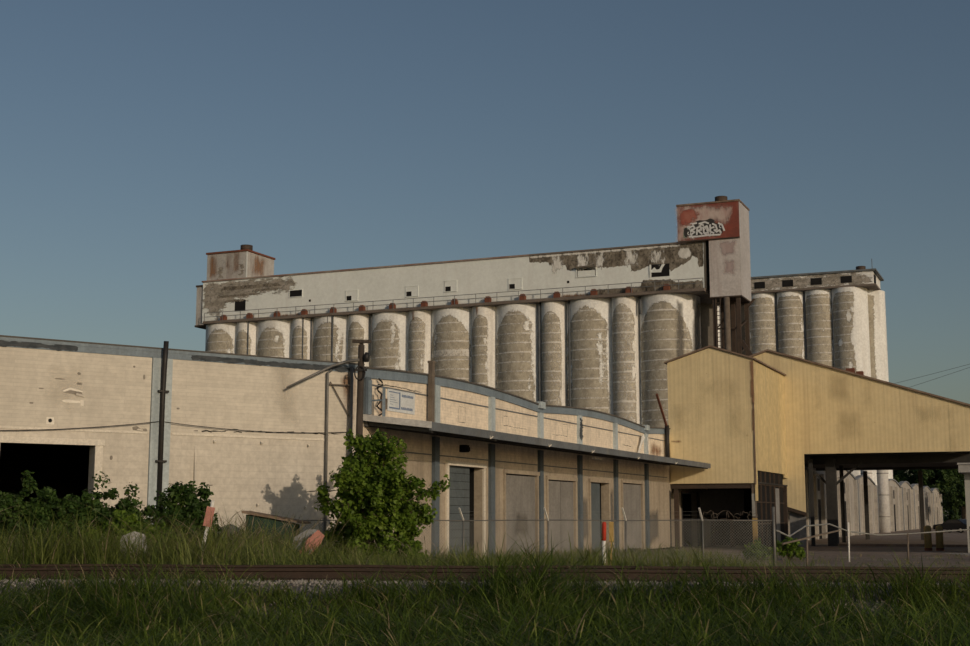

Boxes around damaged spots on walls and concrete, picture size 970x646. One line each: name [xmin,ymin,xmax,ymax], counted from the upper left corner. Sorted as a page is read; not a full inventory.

peeling [191,206,732,453]
peeling [749,291,856,373]
peeling [868,295,877,378]
spalling [55,372,84,406]